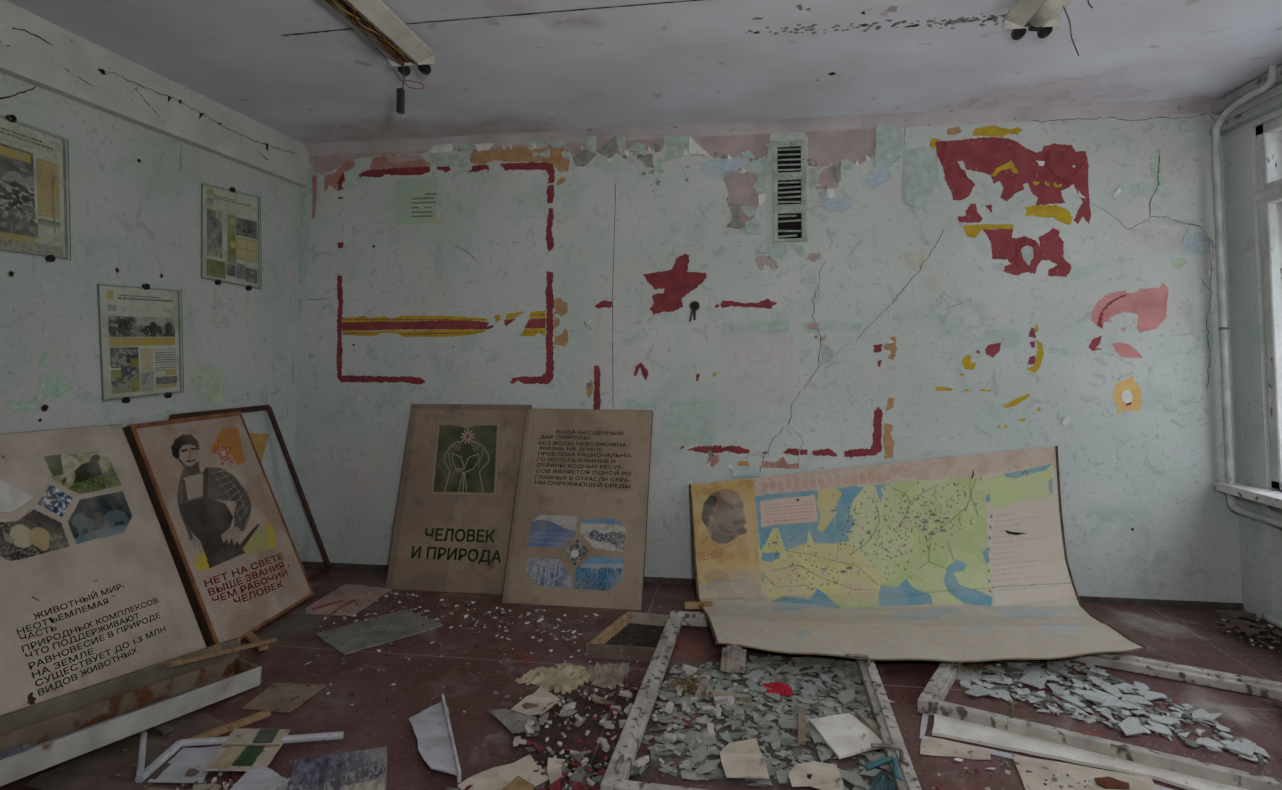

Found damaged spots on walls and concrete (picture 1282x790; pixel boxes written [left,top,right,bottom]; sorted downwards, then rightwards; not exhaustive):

crack [12,27,54,46]
peeling [745,4,1006,35]
crack [0,86,36,100]
crack [76,68,295,154]
peeling [309,133,823,275]
peeling [803,125,939,211]
crack [760,228,957,471]